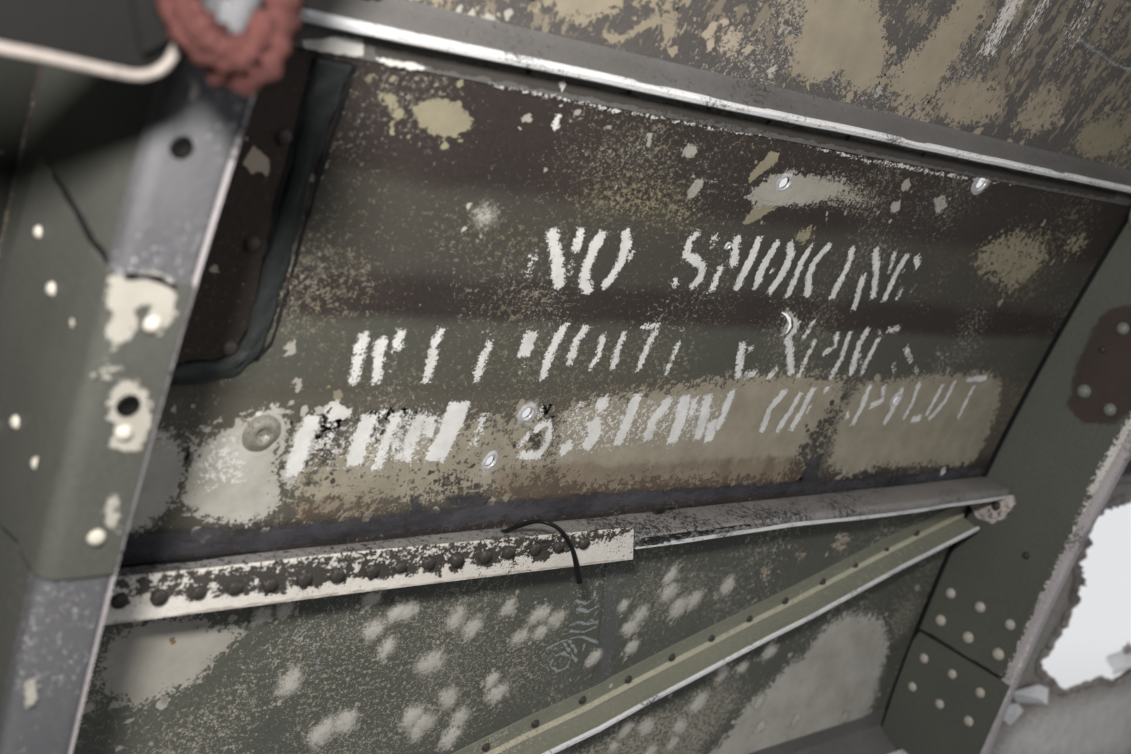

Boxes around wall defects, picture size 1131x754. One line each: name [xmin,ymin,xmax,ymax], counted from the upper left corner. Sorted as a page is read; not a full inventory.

peeling [302,36,474,150]
peeling [87,271,1006,537]
peeling [825,532,851,557]
peeling [1001,415,1131,702]
peeling [77,581,576,754]
peeling [560,584,927,754]